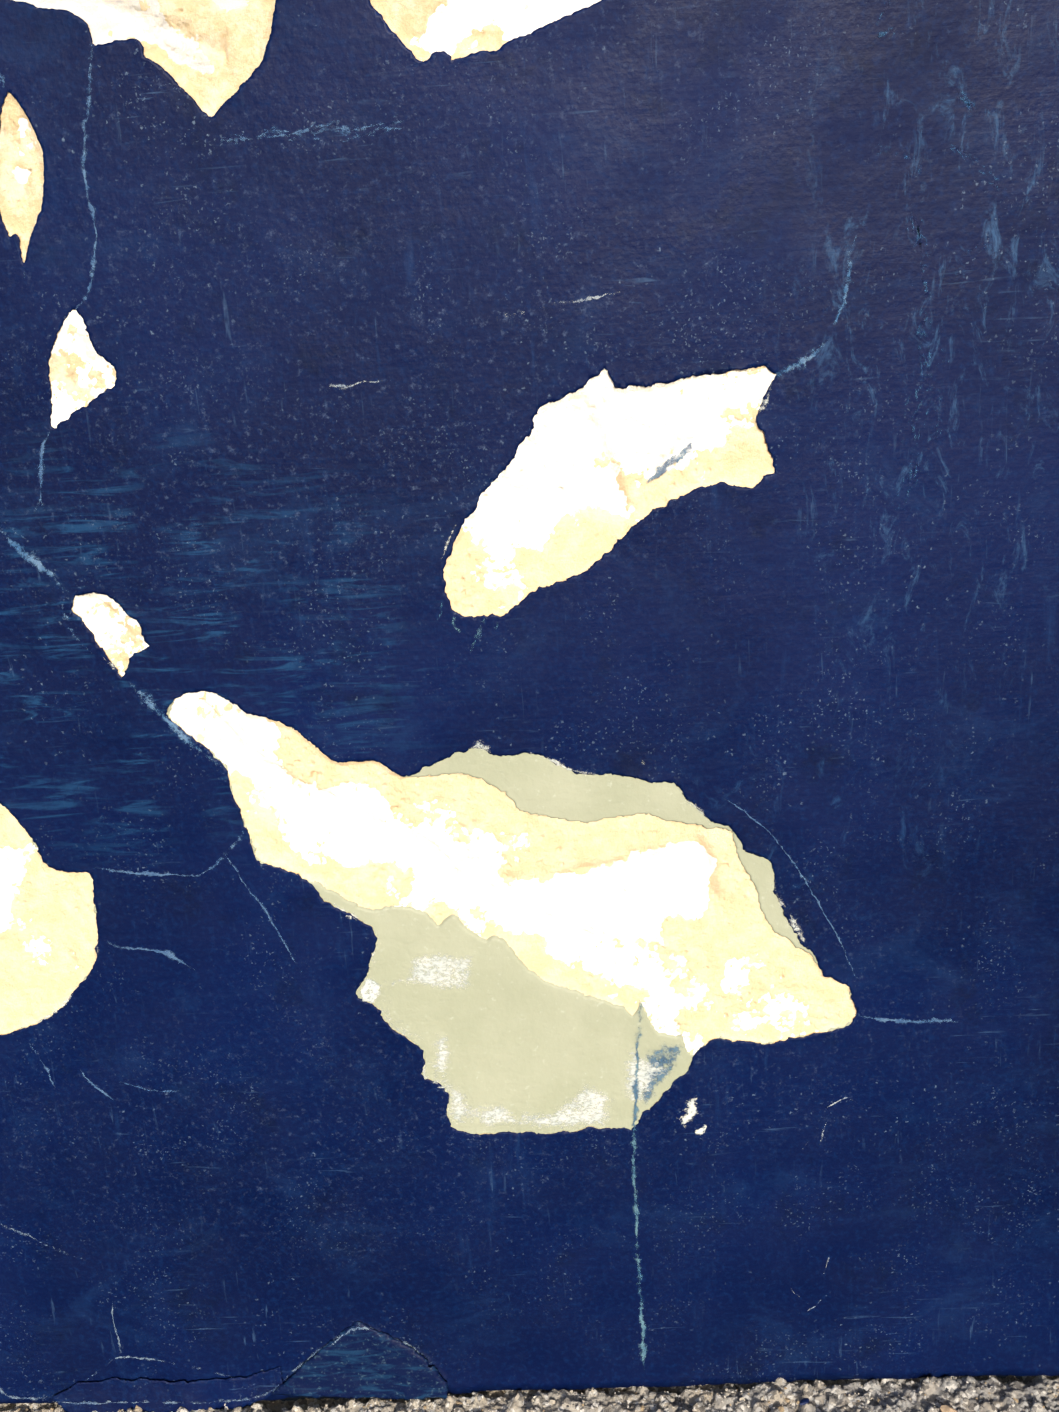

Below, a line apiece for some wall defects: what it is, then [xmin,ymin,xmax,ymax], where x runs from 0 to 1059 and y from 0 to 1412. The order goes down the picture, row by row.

peeling [14,0,275,117]
peeling [370,0,601,62]
peeling [0,92,44,262]
peeling [49,310,117,428]
peeling [443,366,776,617]
peeling [72,592,149,676]
peeling [0,804,98,1034]
peeling [167,691,856,1135]
crack [632,1006,647,1366]